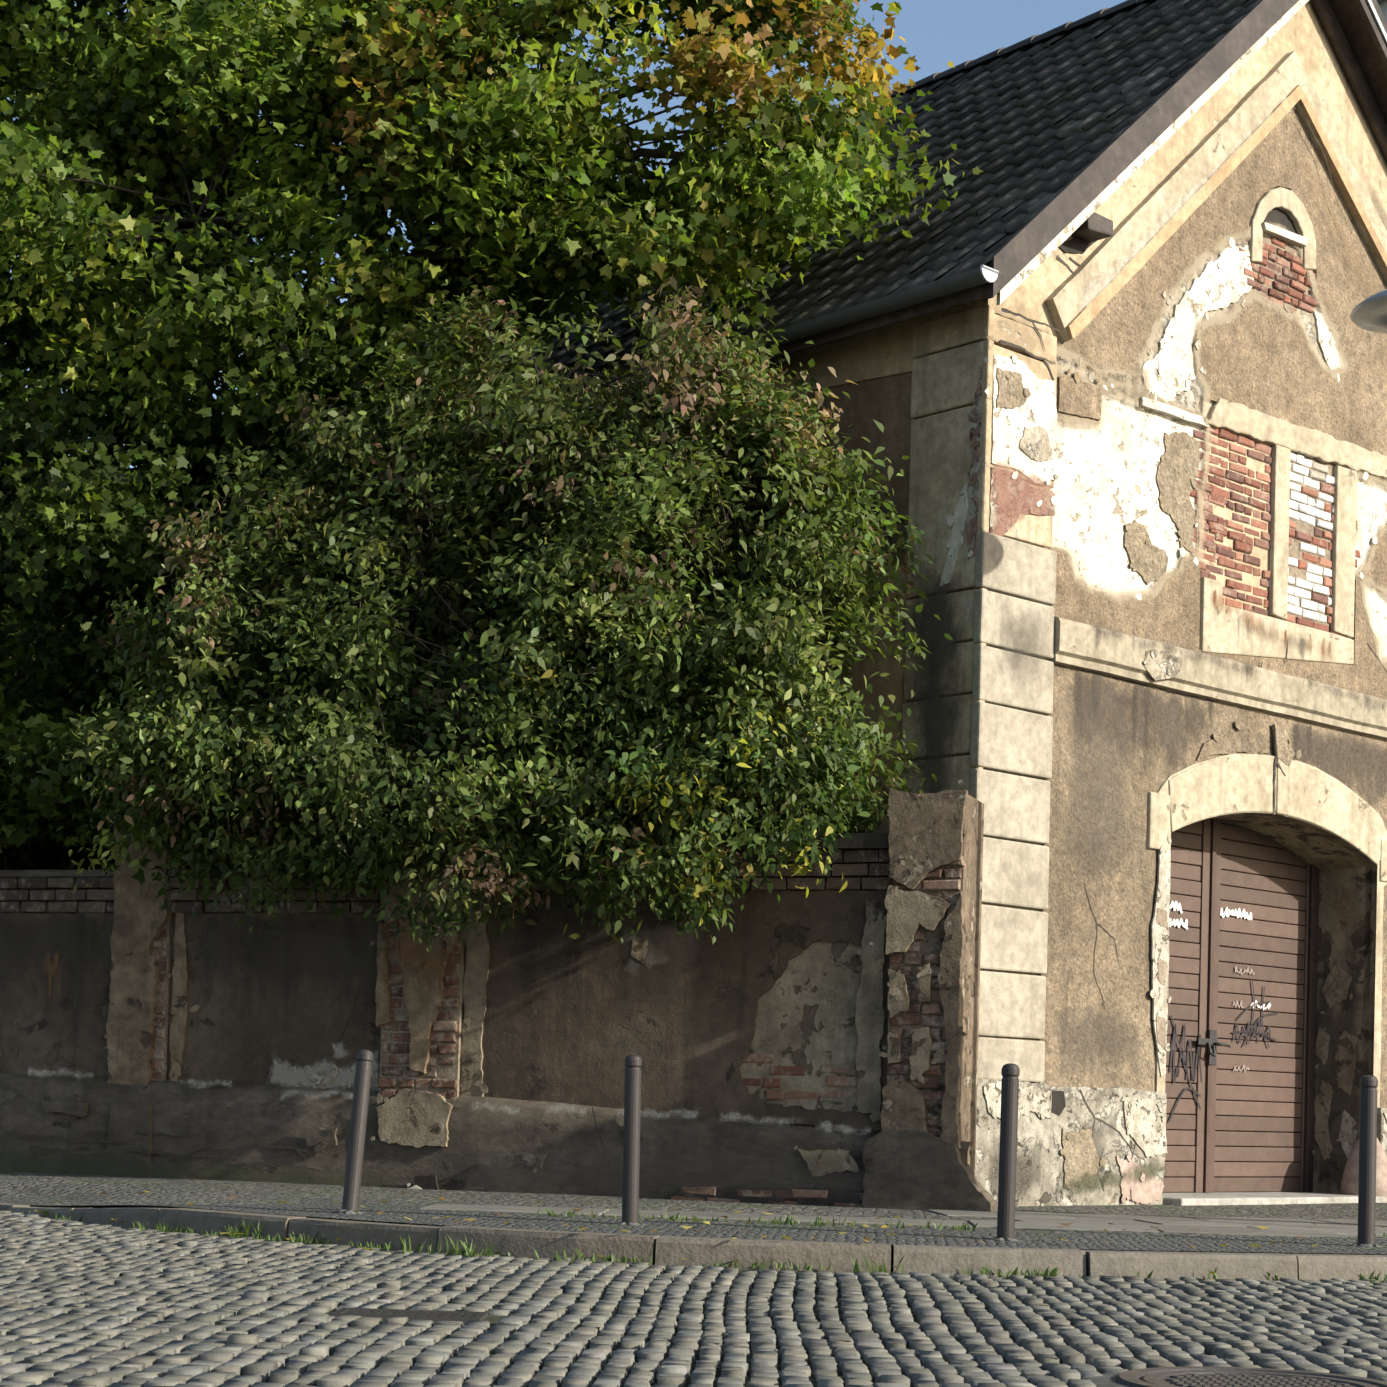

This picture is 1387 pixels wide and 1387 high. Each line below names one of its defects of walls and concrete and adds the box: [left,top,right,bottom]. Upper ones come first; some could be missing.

flaking render [984,225,1348,602]
flaking render [940,483,973,587]
flaking render [1355,472,1387,667]
flaking render [168,913,201,1082]
flaking render [353,896,491,1148]
flaking render [740,898,887,1123]
flaking render [1312,962,1358,1161]